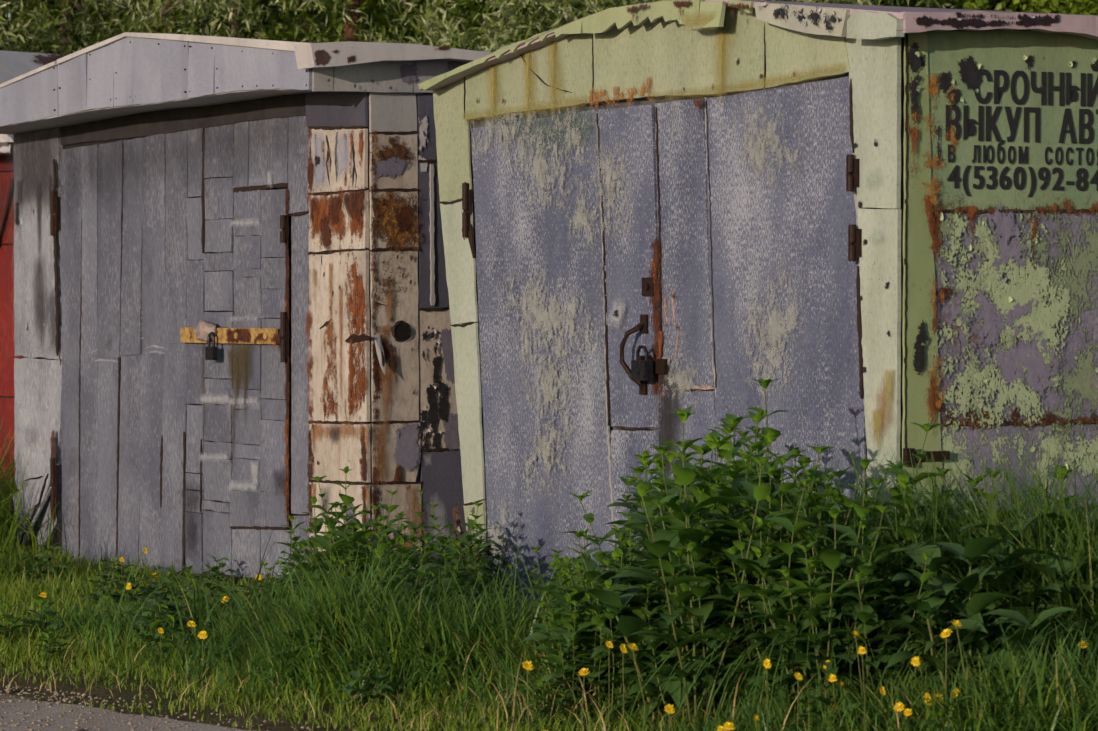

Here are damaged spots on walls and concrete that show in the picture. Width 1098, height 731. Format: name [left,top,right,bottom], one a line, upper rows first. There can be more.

peeling [757,1,835,33]
peeling [913,12,1060,29]
corrosion [588,78,654,108]
corrosion [907,75,1098,259]
corrosion [226,328,280,350]
corrosion [305,128,423,549]
peeling [393,326,460,472]
corrosion [649,236,678,359]
peeling [913,193,1098,514]